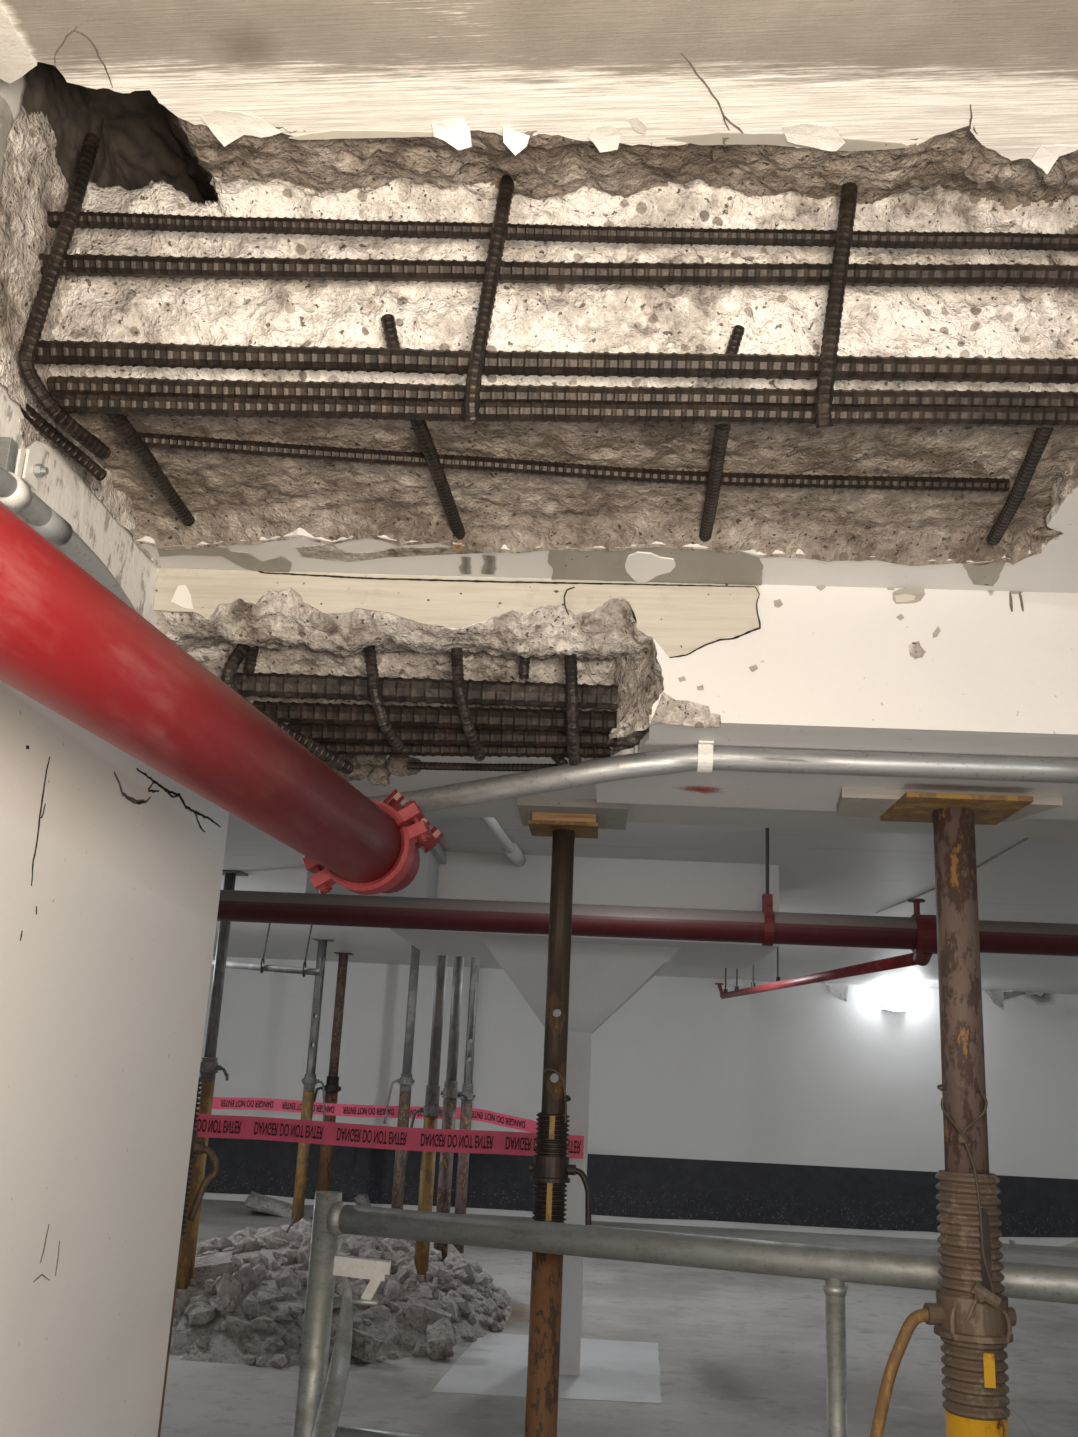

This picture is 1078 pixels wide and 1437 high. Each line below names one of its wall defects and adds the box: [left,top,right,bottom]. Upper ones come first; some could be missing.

spalling [0,6,1078,786]
crack [20,757,50,941]
crack [114,768,221,832]